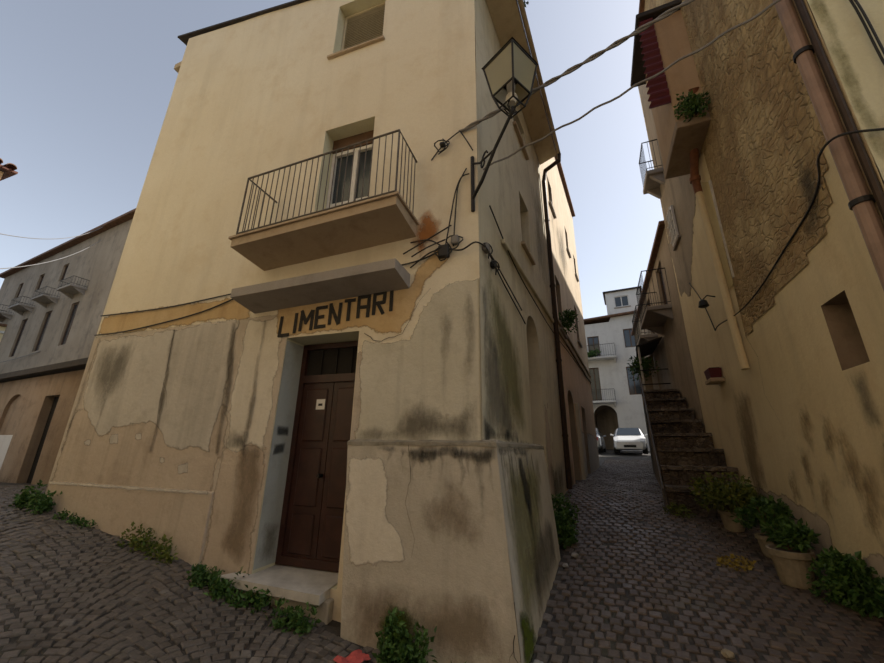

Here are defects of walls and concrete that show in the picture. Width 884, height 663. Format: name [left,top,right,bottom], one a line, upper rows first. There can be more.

corrosion [417,216,437,250]
peeling [84,298,250,452]
peeling [345,457,404,566]
damp [409,423,555,603]